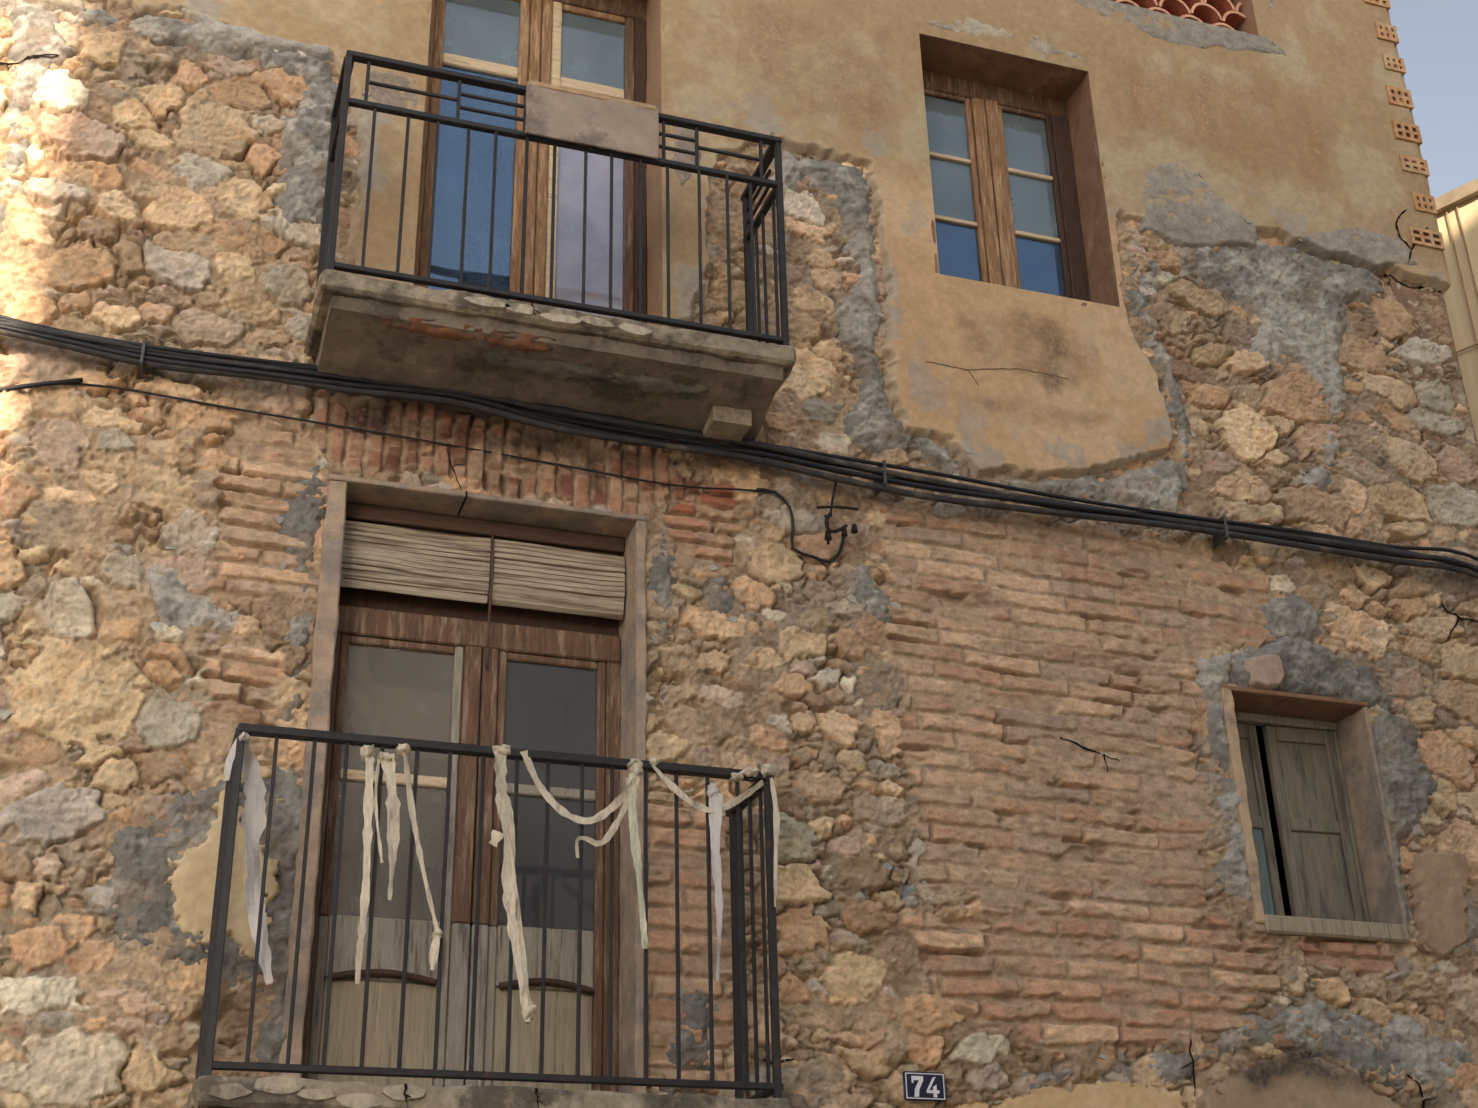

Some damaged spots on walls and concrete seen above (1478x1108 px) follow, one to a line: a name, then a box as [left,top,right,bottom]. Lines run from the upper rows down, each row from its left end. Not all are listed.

spalling [23,0,87,16]
spalling [180,8,333,62]
spalling [1137,162,1257,250]
spalling [1294,227,1418,276]
crack [1395,209,1428,263]
crack [932,362,1067,386]
crack [1441,601,1478,638]
peeling [1243,655,1284,691]
crack [1060,737,1119,773]
peeling [164,790,282,960]